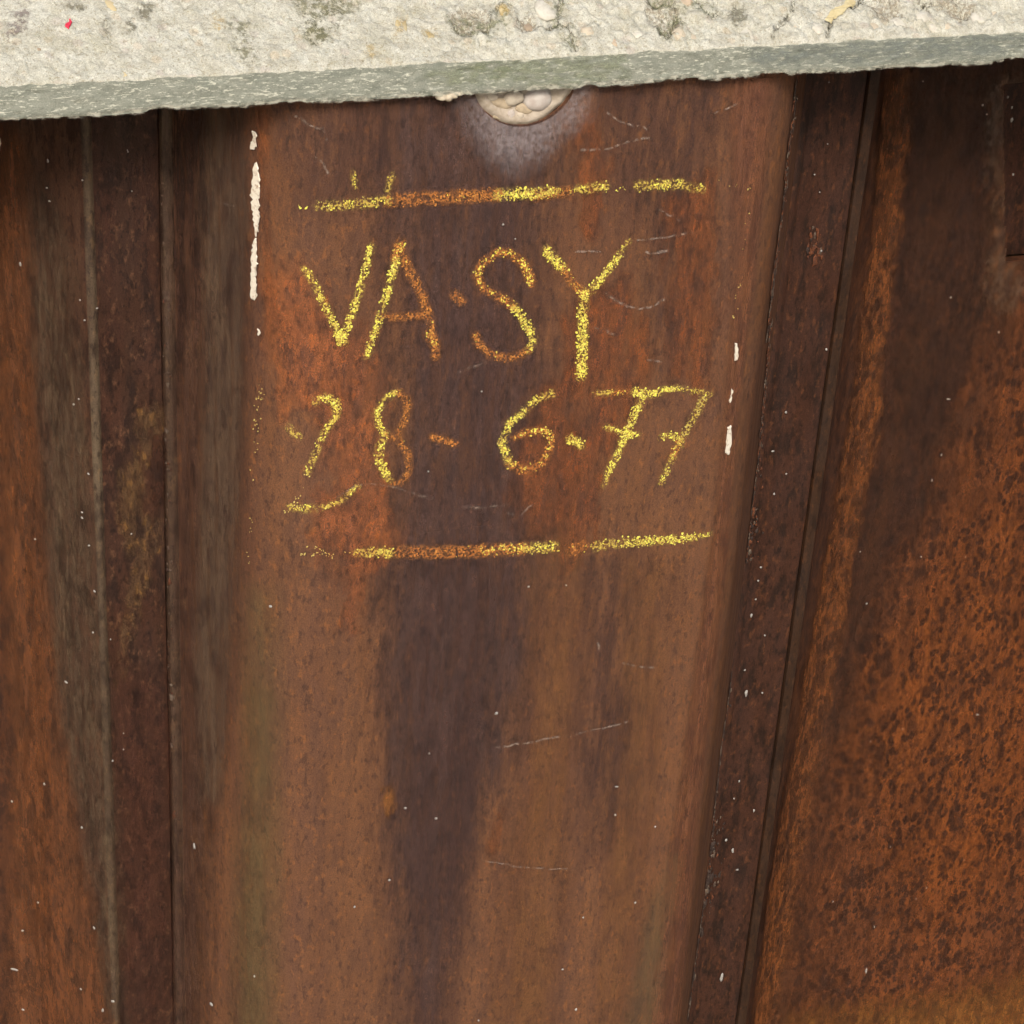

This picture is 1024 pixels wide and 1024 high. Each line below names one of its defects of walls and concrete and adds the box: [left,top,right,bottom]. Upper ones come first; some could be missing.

rust [0,133,109,1024]
rust [116,404,166,643]
rust [263,273,392,573]
damp [379,91,558,1024]
rust [509,278,649,576]
damp [527,76,683,90]
rust [648,77,768,1024]
rust [754,70,1024,1024]